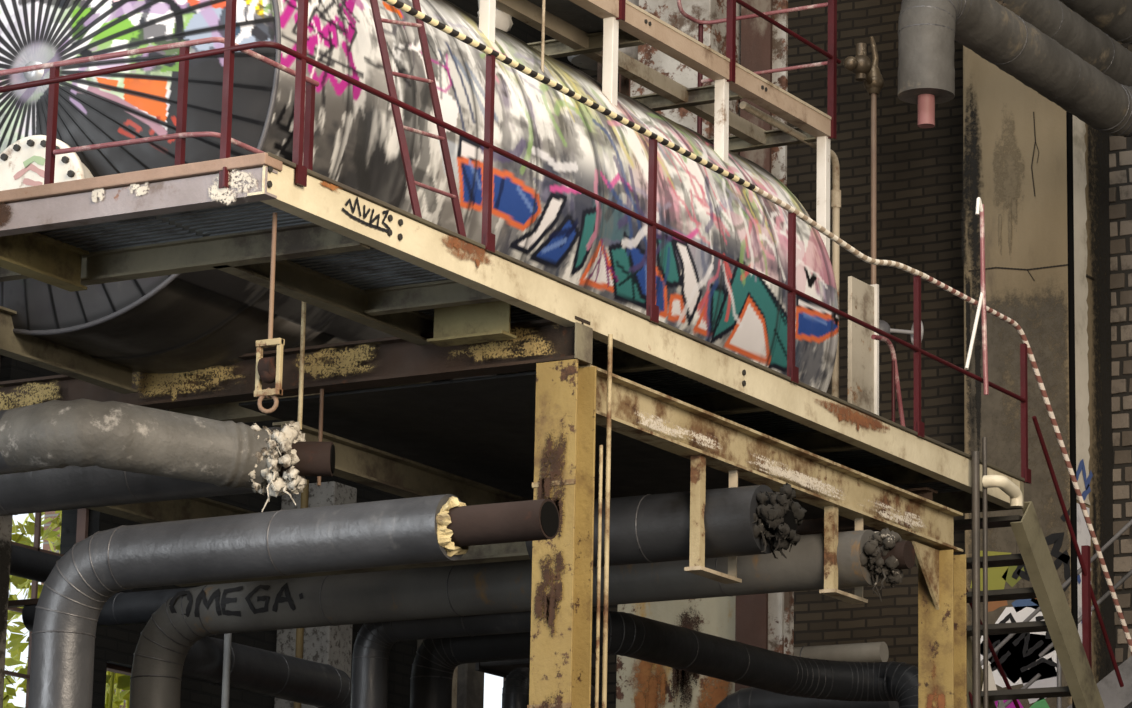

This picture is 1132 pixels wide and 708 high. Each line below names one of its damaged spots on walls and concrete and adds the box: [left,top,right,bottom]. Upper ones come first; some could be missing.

damp [993,120,1024,253]
rust [534,431,567,636]
rust [676,607,700,631]
rust [533,693,562,708]
rust [633,660,732,708]
rust [926,661,945,708]